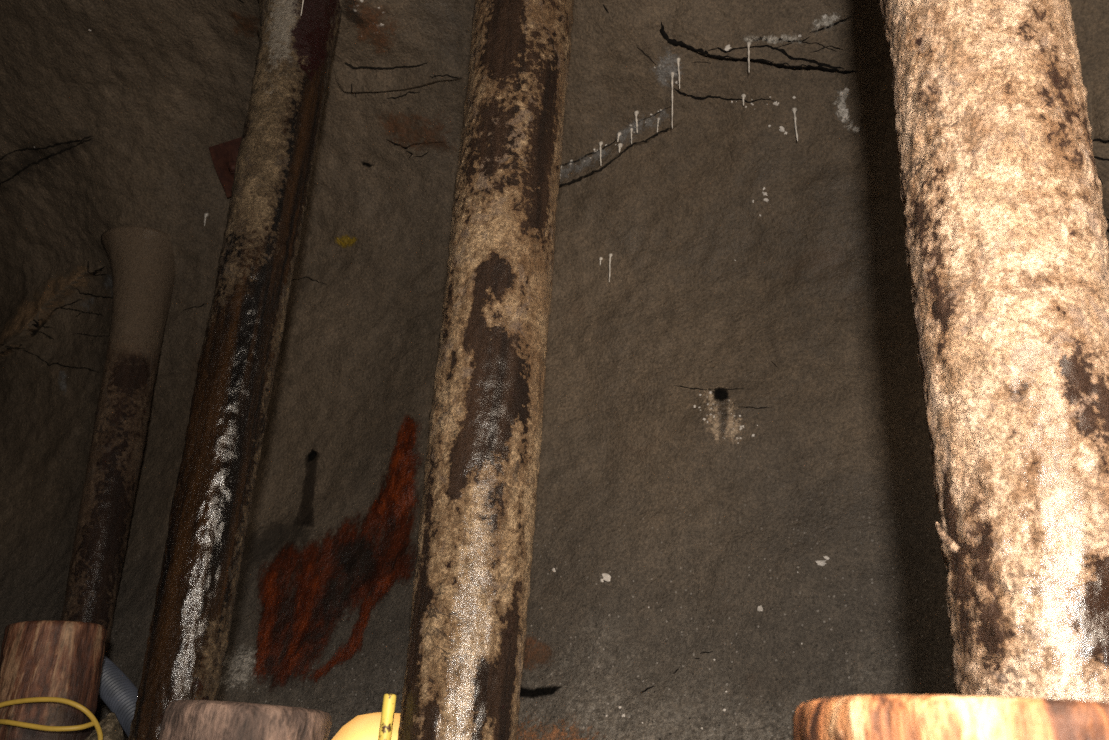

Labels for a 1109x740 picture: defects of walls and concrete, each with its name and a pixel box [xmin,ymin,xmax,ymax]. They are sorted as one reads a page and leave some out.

crack [637,17,857,74]
leakage [744,14,840,44]
crack [559,88,775,188]
leakage [834,88,859,132]
crack [1092,138,1109,185]
rust [254,416,421,687]